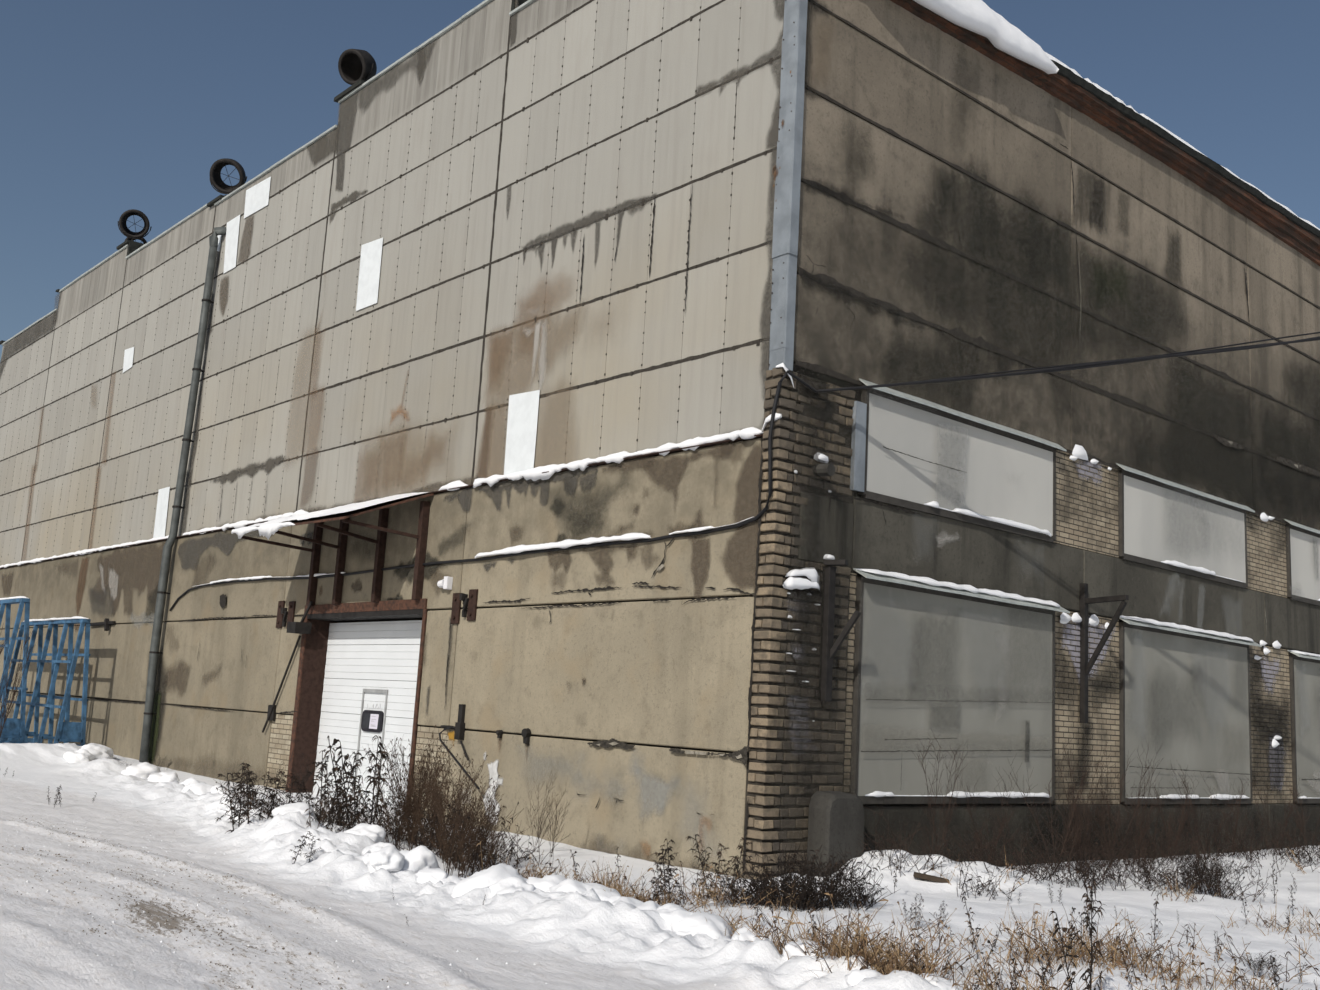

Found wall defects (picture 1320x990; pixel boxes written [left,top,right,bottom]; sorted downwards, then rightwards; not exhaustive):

water stain [308,43,435,222]
water stain [523,194,656,266]
water stain [696,0,785,400]
water stain [913,170,1183,360]
corrosion [519,322,545,388]
water stain [387,527,465,601]
corrosion [485,406,503,477]
water stain [413,442,763,597]
water stain [1076,462,1102,482]
water stain [1136,365,1320,512]